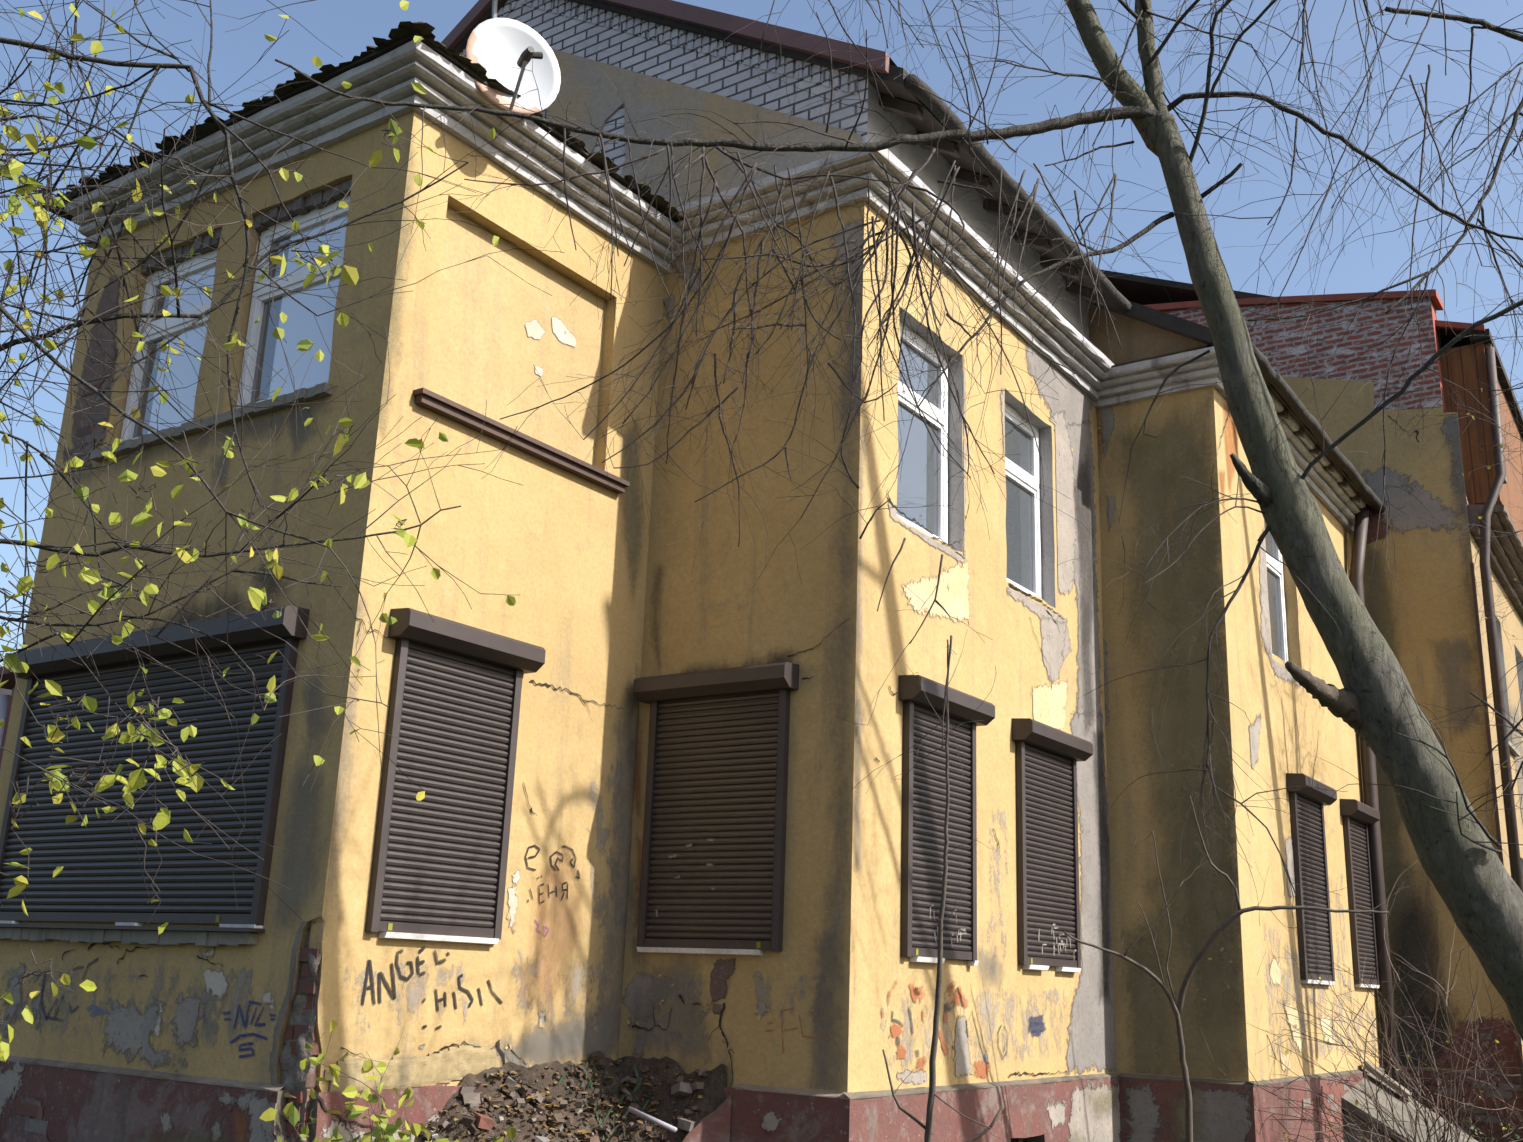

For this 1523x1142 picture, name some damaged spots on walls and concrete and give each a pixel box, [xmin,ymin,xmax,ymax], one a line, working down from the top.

peeling [525,316,576,347]
water stain [842,334,863,655]
peeling [888,360,971,624]
water stain [1075,461,1110,997]
peeling [1007,340,1252,1142]
water stain [1125,421,1243,1077]
water stain [1367,551,1394,653]
peeling [1362,466,1468,544]
peeling [0,962,72,1037]
peeling [103,947,228,1073]
spalling [210,921,443,1142]
water stain [1375,756,1448,1067]